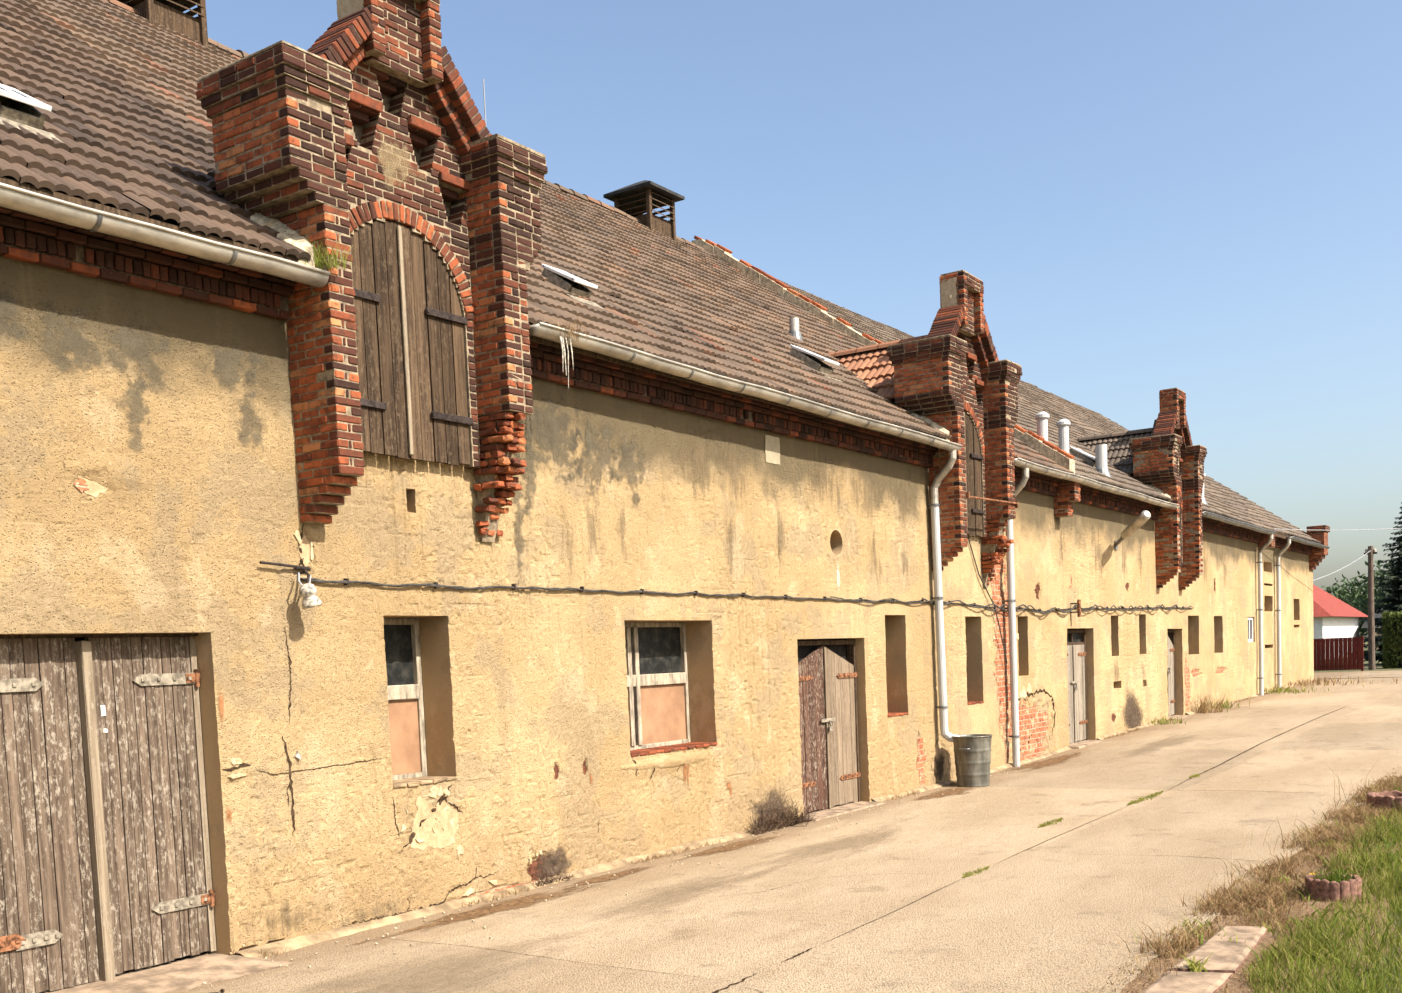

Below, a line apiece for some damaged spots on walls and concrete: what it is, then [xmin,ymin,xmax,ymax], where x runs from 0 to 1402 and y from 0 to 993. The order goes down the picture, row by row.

leakage [214,347,262,444]
flaking render [74,475,108,499]
flaking render [991,551,1050,761]
crack [223,625,389,835]
flaking render [400,785,464,858]